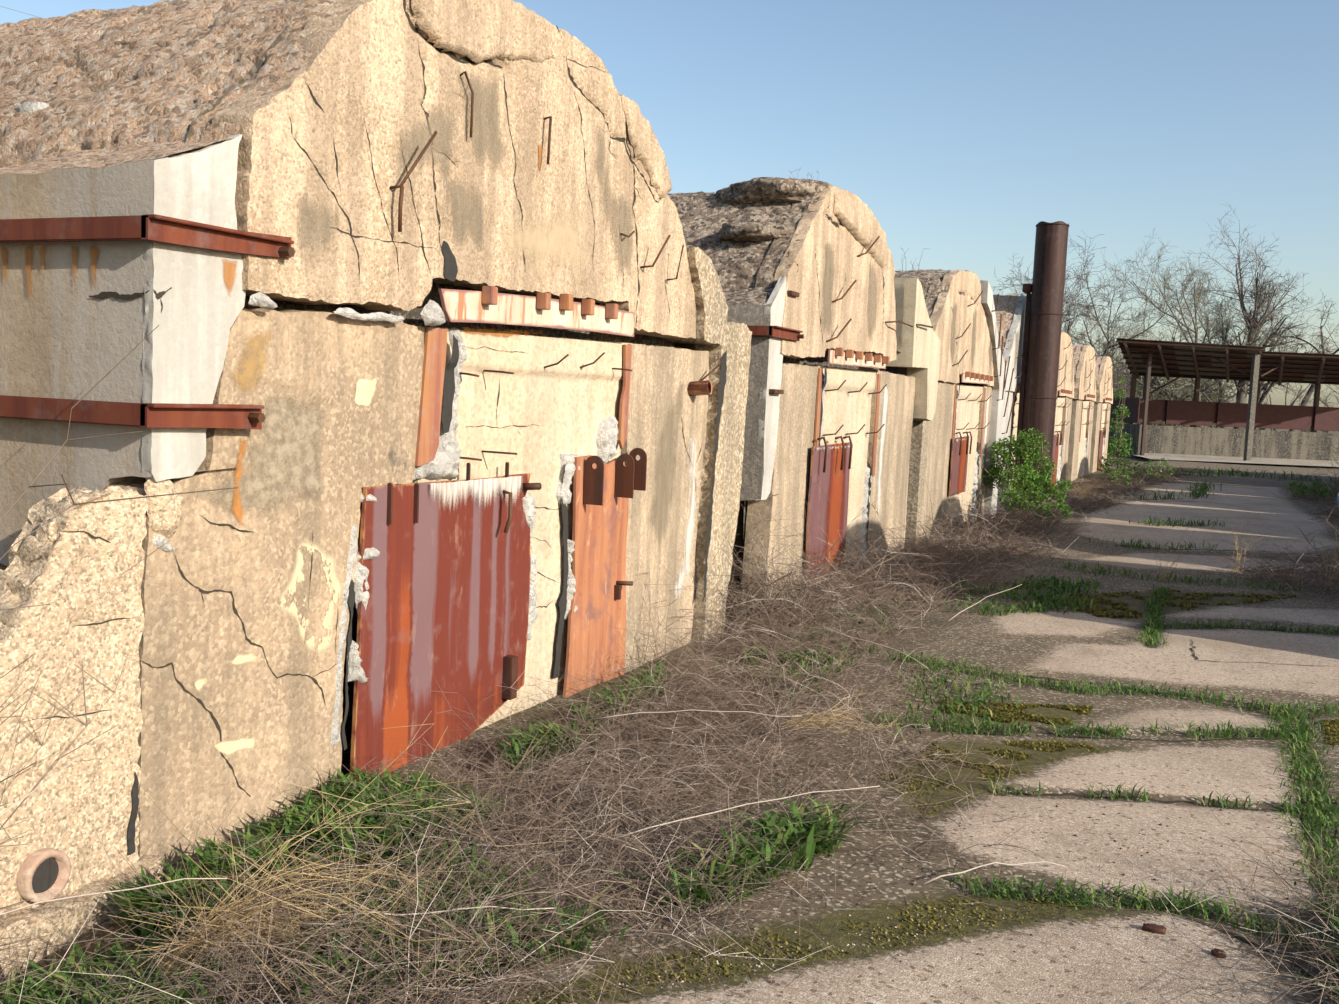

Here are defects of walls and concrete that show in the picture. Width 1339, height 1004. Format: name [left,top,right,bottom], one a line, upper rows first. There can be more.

crack [289,0,527,290]
crack [556,25,670,323]
rust [72,246,99,290]
crack [89,287,172,313]
spalling [334,307,404,323]
rust [233,441,247,524]
spalling [413,300,538,641]
spalling [555,453,580,506]
crack [175,556,355,750]
peeling [278,524,380,747]
spalling [562,539,578,620]
crack [142,661,251,797]